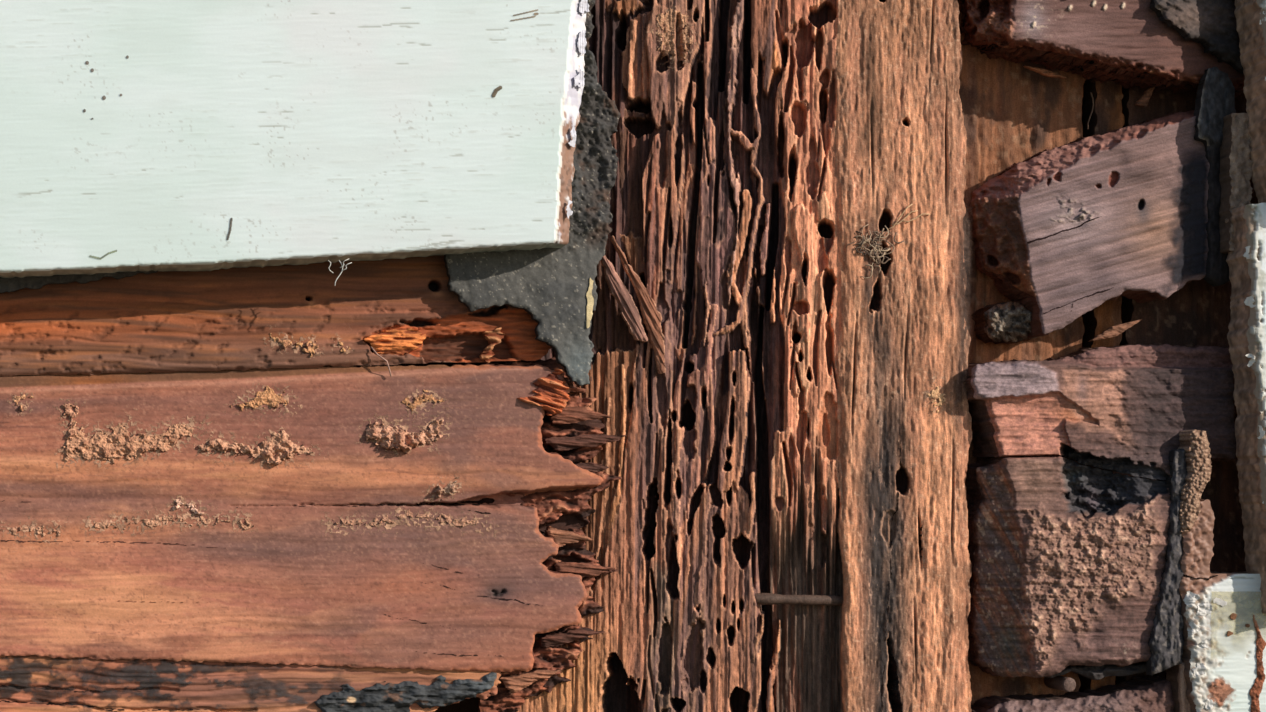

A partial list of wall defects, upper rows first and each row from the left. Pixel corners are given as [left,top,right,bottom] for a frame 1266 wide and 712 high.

crack [271,498,495,514]
rust [1208,613,1266,712]